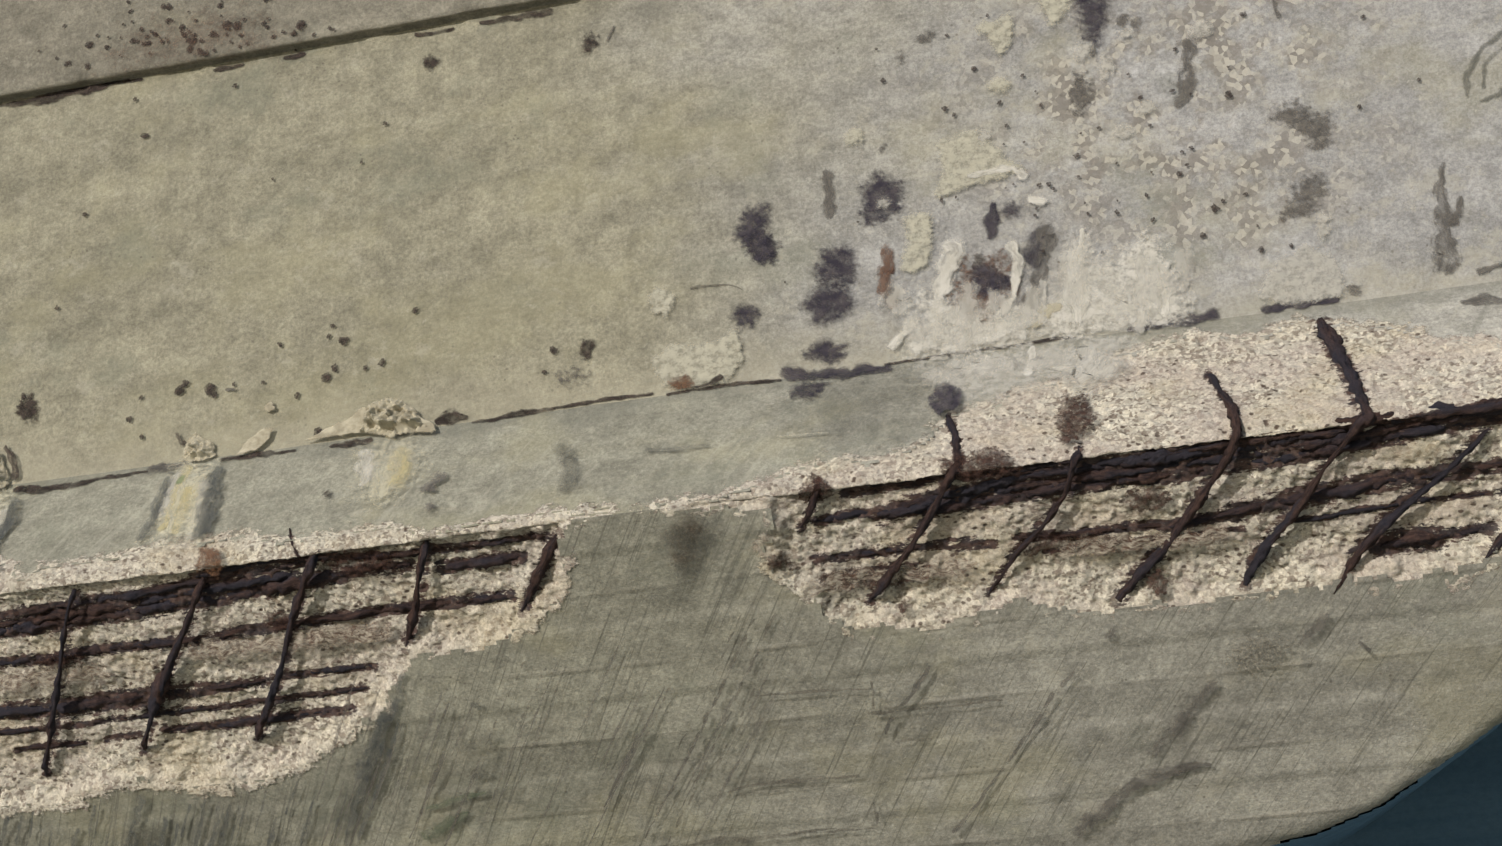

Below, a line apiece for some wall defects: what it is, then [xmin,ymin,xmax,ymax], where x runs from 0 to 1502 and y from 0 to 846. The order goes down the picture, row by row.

leakage [1069,0,1142,116]
crack [1463,32,1502,102]
leakage [0,165,1219,541]
spalling [0,214,1502,819]